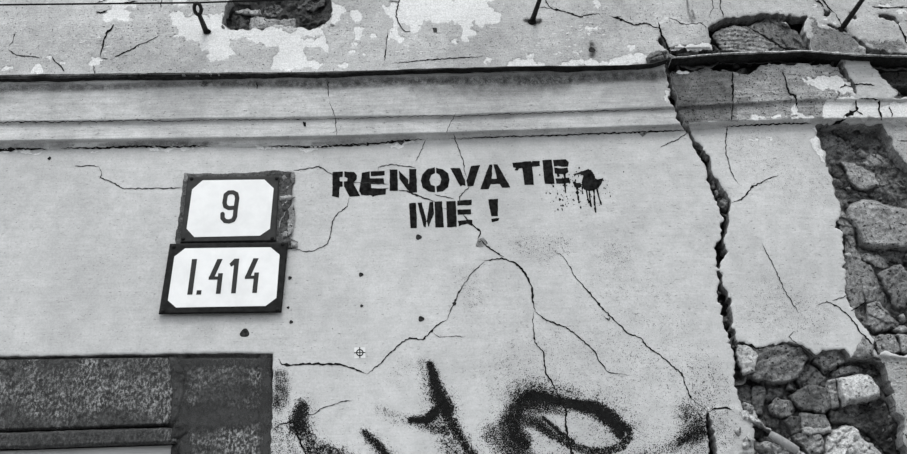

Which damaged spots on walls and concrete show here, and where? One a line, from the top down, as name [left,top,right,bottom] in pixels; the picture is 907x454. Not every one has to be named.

peeling [170,0,501,71]
peeling [507,53,545,66]
flaking render [559,17,906,77]
crack [747,26,794,50]
crack [696,72,811,268]
crack [0,0,724,454]
flaking render [728,66,907,454]
crack [717,288,766,385]